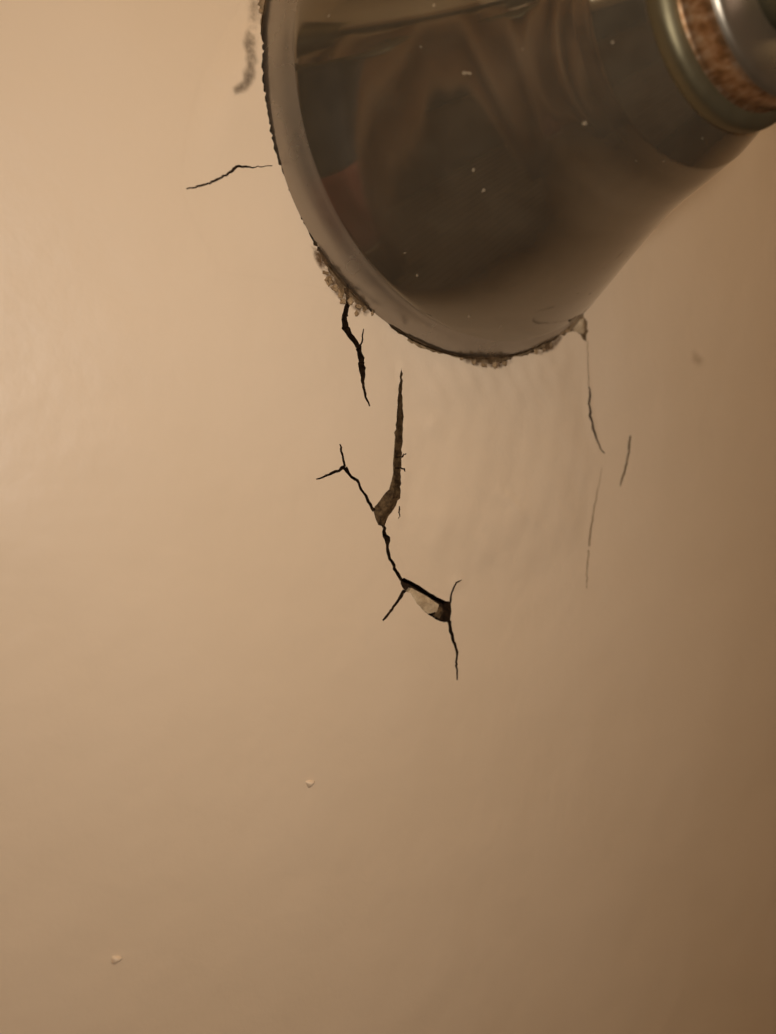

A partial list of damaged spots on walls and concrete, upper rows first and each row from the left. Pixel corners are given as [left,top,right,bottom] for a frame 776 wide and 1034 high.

crack [186,165,272,189]
crack [342,288,370,406]
crack [316,368,461,680]
crack [586,341,631,589]